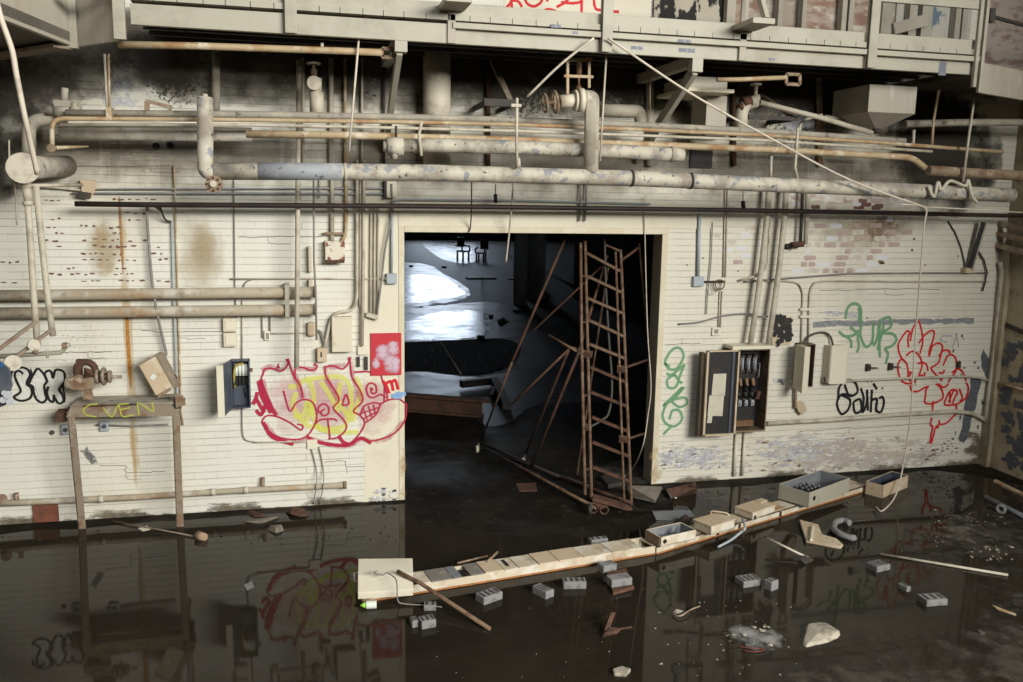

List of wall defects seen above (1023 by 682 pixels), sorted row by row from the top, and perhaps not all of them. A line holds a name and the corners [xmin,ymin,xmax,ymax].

peeling [788,194,915,273]
peeling [657,443,729,470]
spalling [744,349,989,473]
peeling [998,340,1023,471]